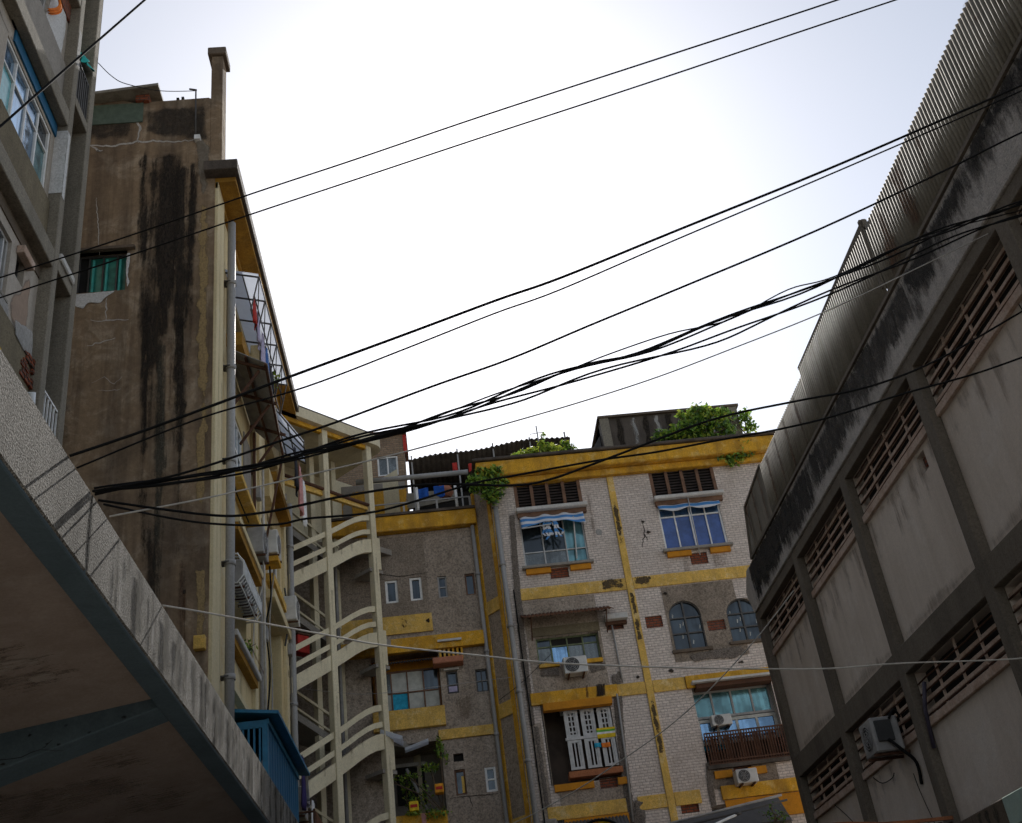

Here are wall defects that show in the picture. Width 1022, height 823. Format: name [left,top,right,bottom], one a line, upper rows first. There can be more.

crack [90,122,194,152]
spalling [15,320,36,390]
flaking render [75,291,114,308]
water stain [749,52,1022,601]
water stain [115,153,296,823]